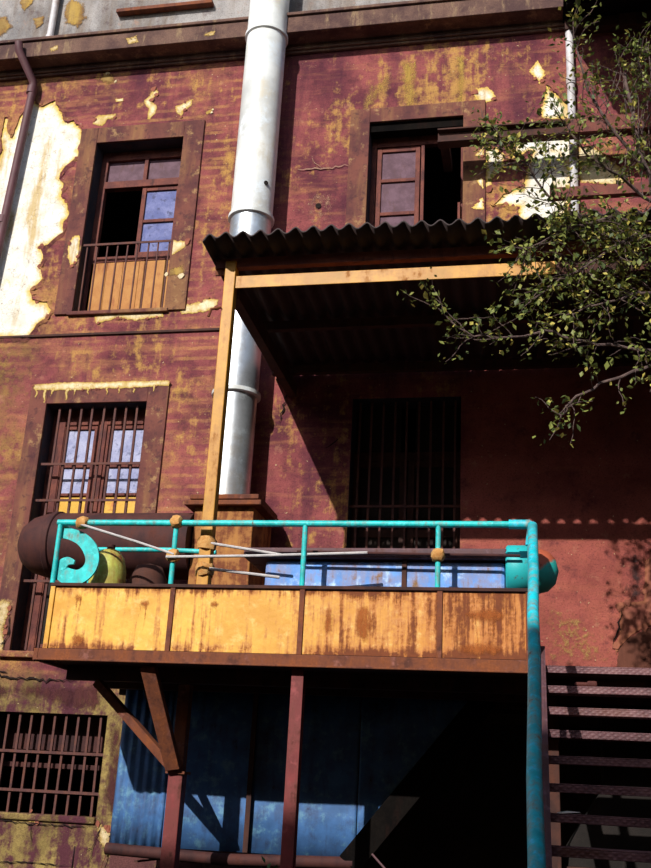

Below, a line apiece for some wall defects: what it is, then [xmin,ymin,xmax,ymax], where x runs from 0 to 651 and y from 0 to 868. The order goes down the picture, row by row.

flaking render [0,16,13,36]
flaking render [64,0,87,28]
flaking render [144,86,158,119]
flaking render [175,99,193,118]
flaking render [471,87,497,102]
flaking render [529,61,568,121]
flaking render [471,140,636,219]
flaking render [0,97,117,343]
spalling [0,599,12,650]
rust [356,607,371,639]
crack [0,671,71,683]
leakage [105,730,120,812]